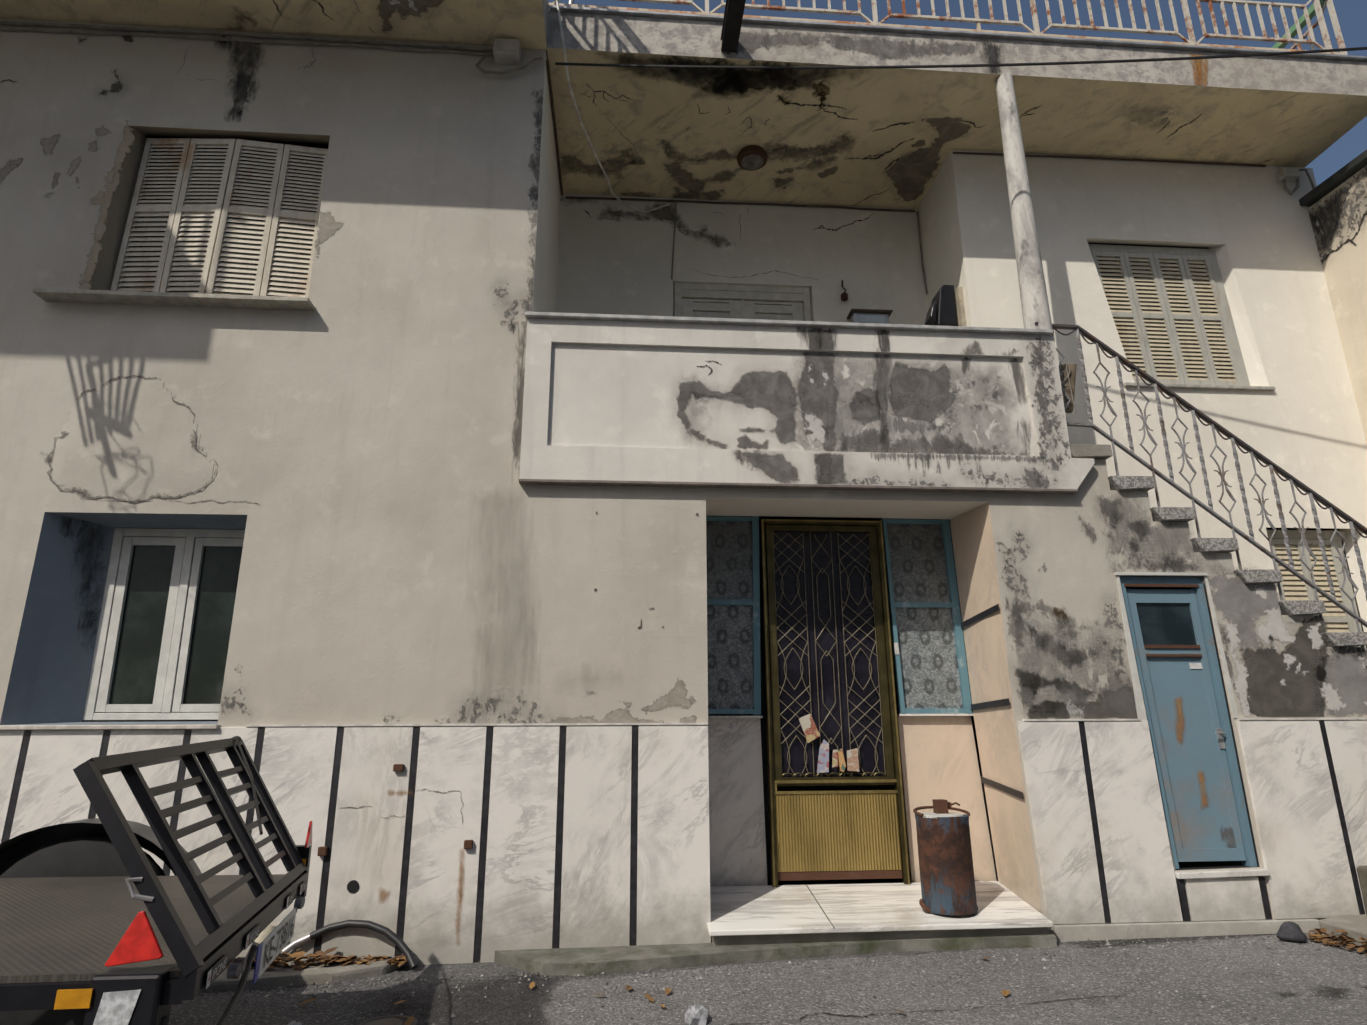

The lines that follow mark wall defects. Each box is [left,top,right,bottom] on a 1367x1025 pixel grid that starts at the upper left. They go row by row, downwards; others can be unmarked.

crack [313,0,376,34]
corrosion [1192,54,1208,86]
damp [767,135,853,169]
spalling [885,117,970,201]
damp [1309,167,1367,264]
flaking render [677,371,797,449]
flaking render [849,362,1001,448]
damp [1080,496,1193,572]
damp [1006,598,1123,713]
flaking render [1202,569,1367,717]
flaking render [437,678,697,724]
corrosion [1176,699,1184,741]